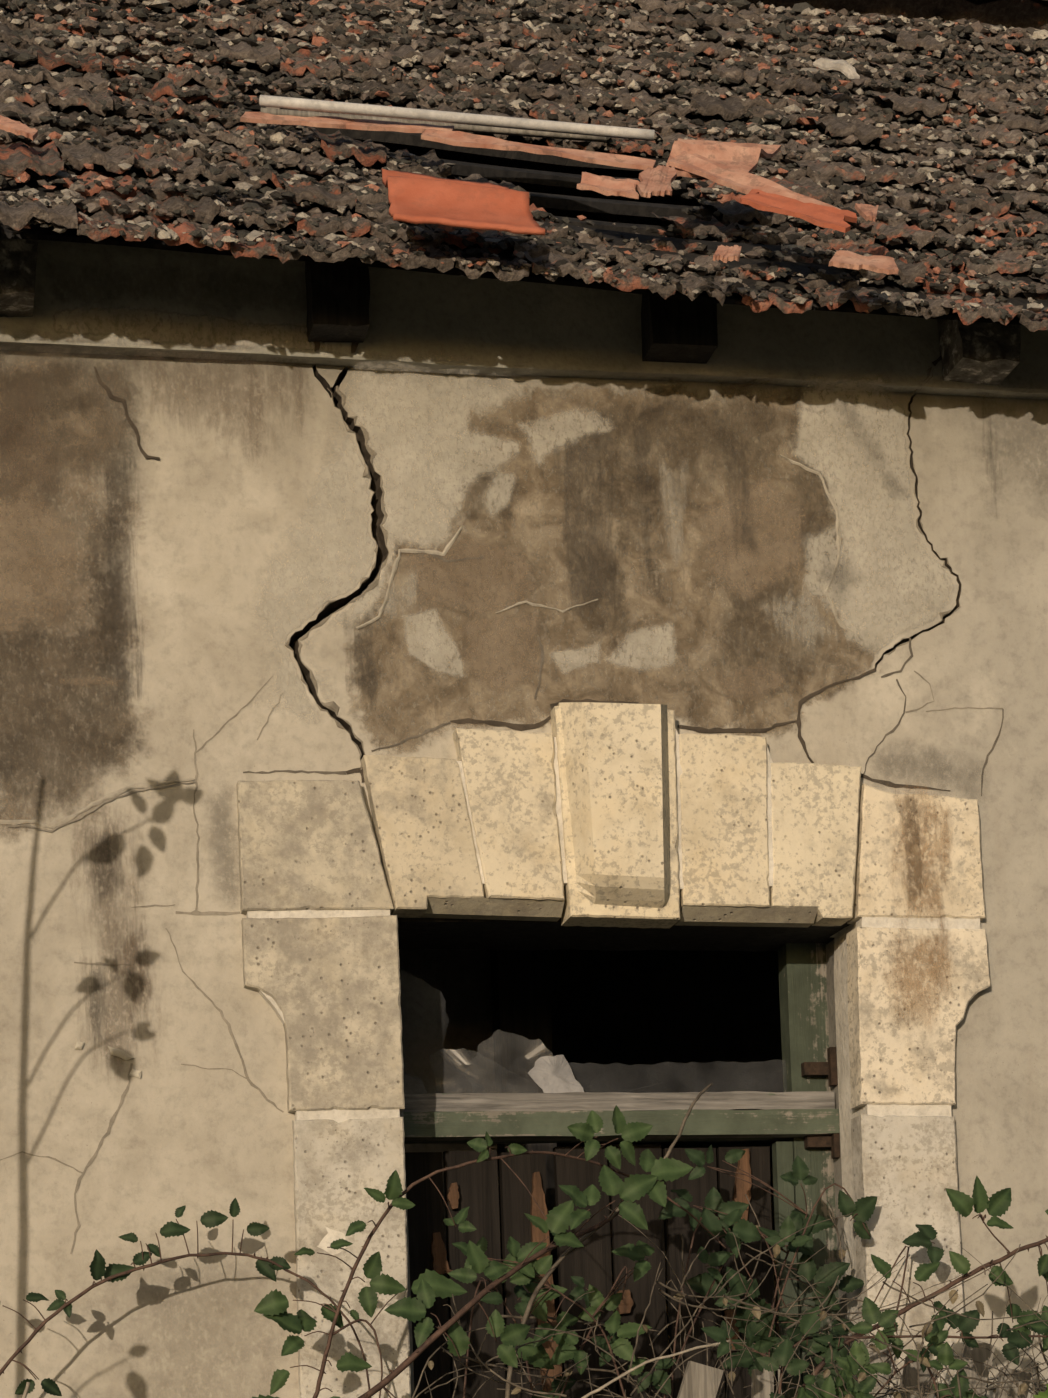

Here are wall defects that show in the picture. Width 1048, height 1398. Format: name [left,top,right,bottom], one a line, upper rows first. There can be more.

damp [0,353,137,829]
crack [0,341,638,1112]
peeling [347,384,875,751]
crack [677,356,1004,796]
crack [1,1063,133,1254]